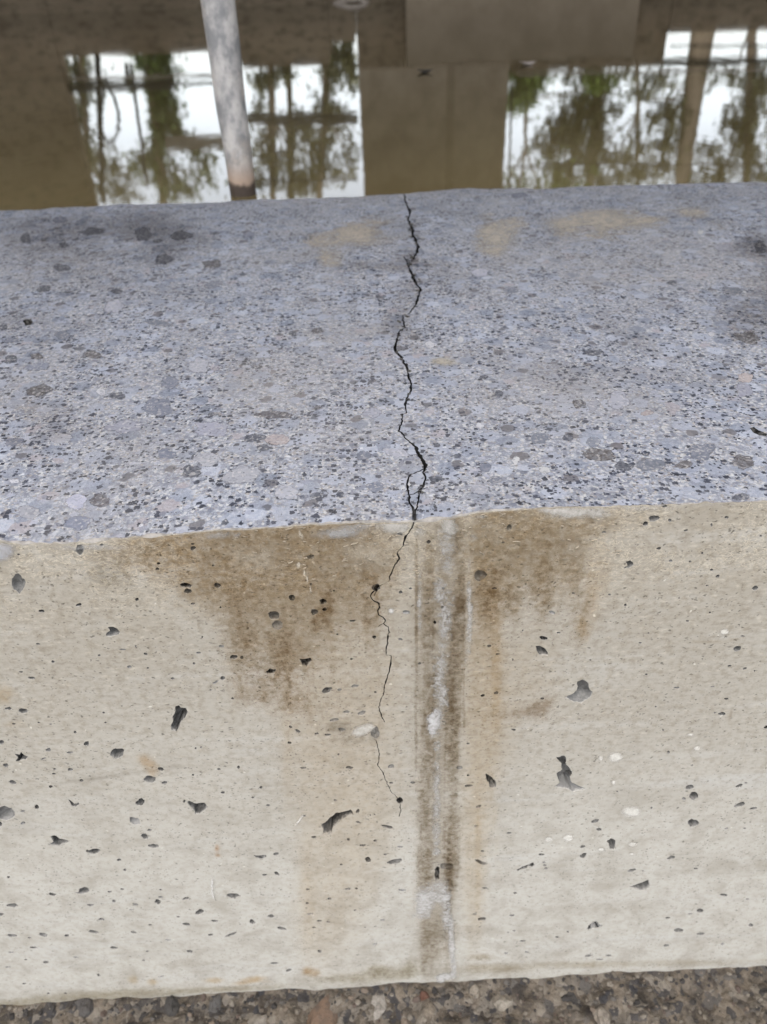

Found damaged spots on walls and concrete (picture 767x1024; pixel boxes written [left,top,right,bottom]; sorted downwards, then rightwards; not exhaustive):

crack [370,195,428,816]
damp [428,579,450,854]
damp [417,883,456,983]